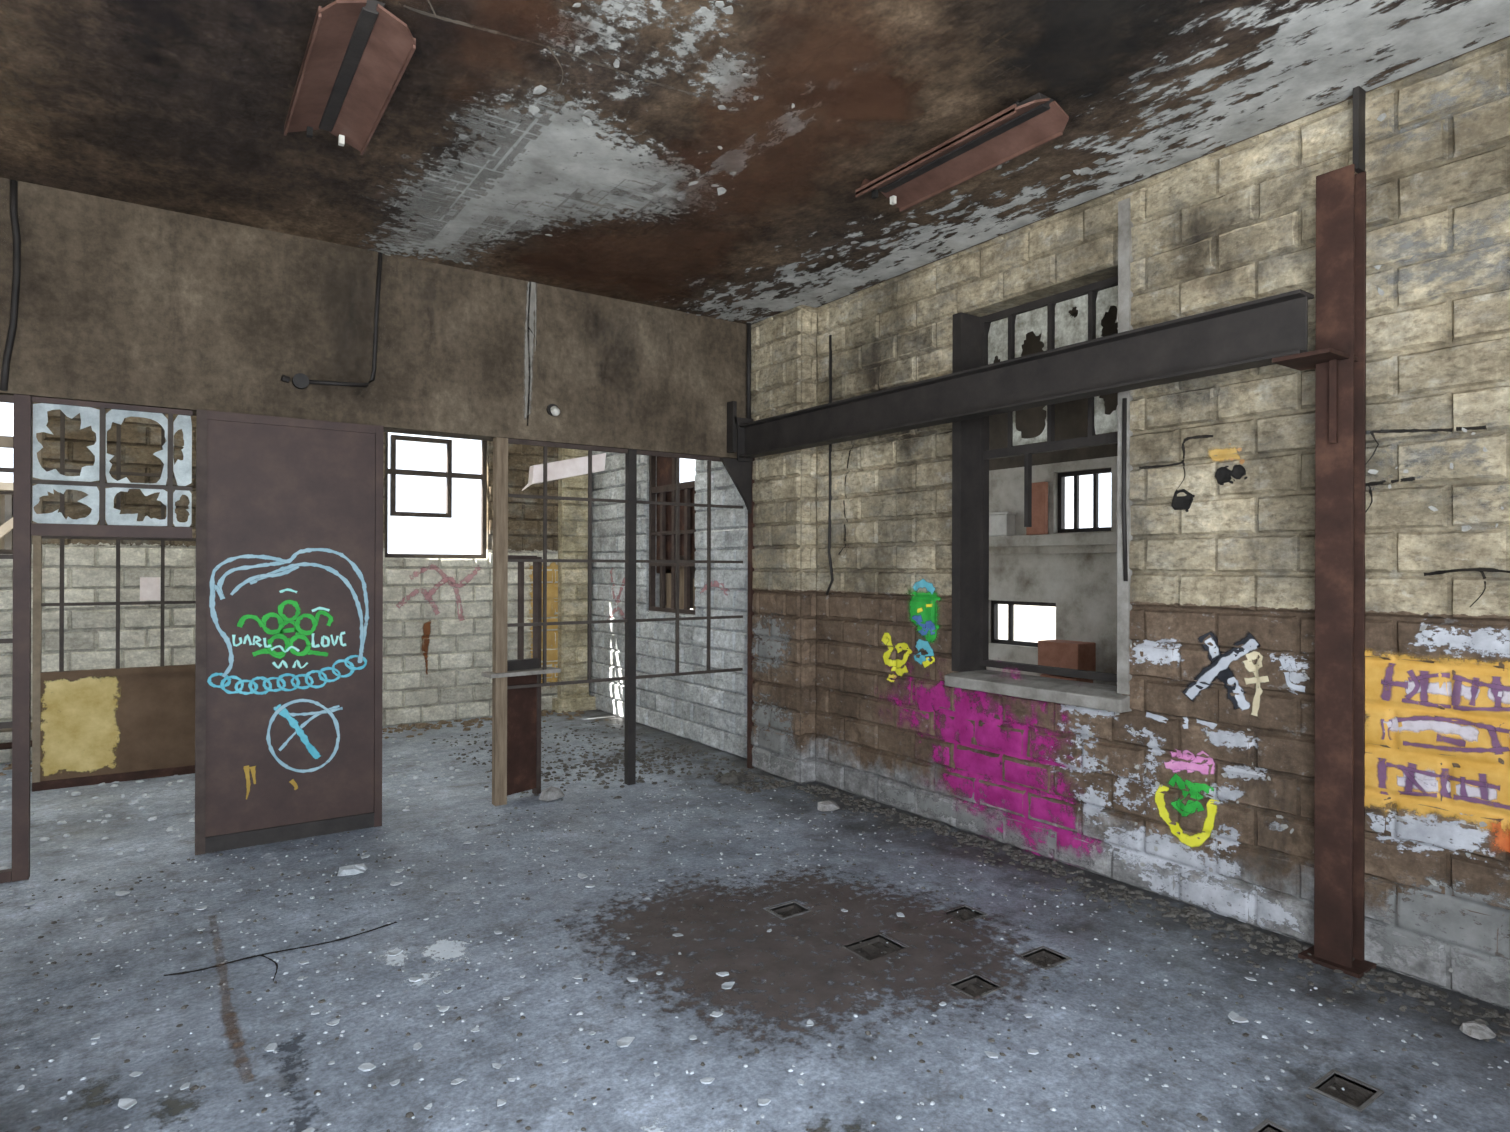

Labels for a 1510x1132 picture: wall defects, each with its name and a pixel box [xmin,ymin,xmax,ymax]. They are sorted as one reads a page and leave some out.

peeling [358,0,770,269]
peeling [649,0,1510,324]
peeling [751,612,803,774]
peeling [1407,618,1510,658]
peeling [1367,809,1510,991]